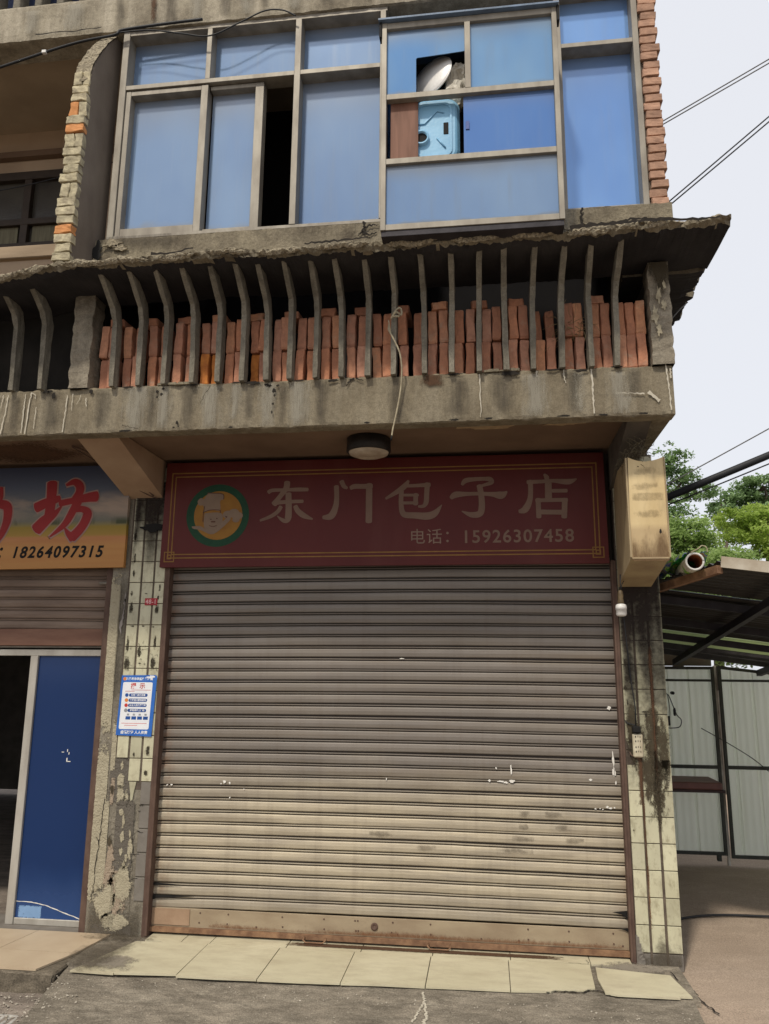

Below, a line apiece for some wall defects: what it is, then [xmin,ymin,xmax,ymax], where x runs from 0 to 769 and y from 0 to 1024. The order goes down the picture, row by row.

spalling [0,37,194,281]
spalling [207,240,371,255]
crack [305,221,377,245]
spalling [385,239,434,247]
spalling [451,235,498,243]
peeling [651,280,688,336]
damp [563,369,595,413]
damp [648,364,672,410]
damp [0,392,83,463]
peeling [87,572,161,932]
damp [626,648,671,831]
corrosion [325,932,608,948]